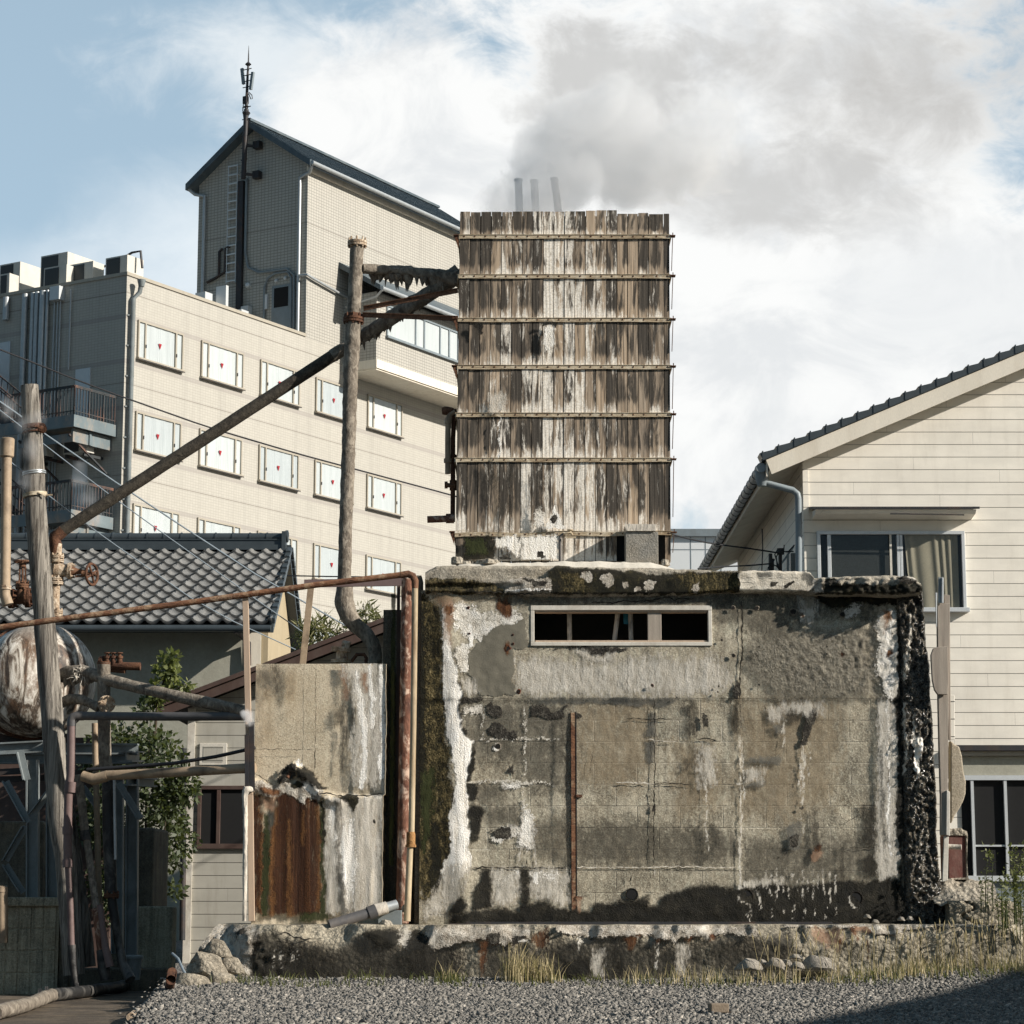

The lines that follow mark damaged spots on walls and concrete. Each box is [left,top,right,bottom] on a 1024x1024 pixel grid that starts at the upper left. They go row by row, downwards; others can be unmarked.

water stain [541,321,557,357]
water stain [464,421,565,559]
peeling [450,600,524,750]
rust [253,792,322,916]
rust [571,713,582,912]
water stain [250,592,945,980]